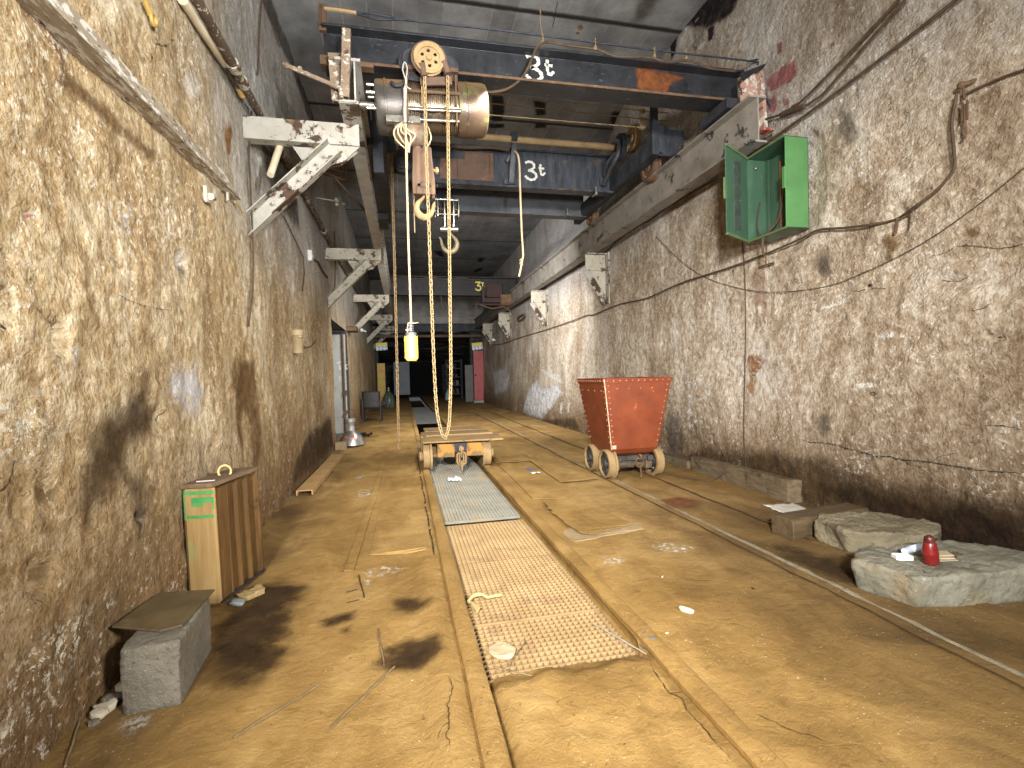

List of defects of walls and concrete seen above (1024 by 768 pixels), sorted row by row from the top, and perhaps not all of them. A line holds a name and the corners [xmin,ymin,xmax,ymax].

rust [636,68,682,92]
rust [748,356,763,392]
leakage [233,361,260,466]
leakage [89,401,152,496]
leakage [294,419,333,480]
crack [475,408,1024,688]
leakage [381,636,441,669]